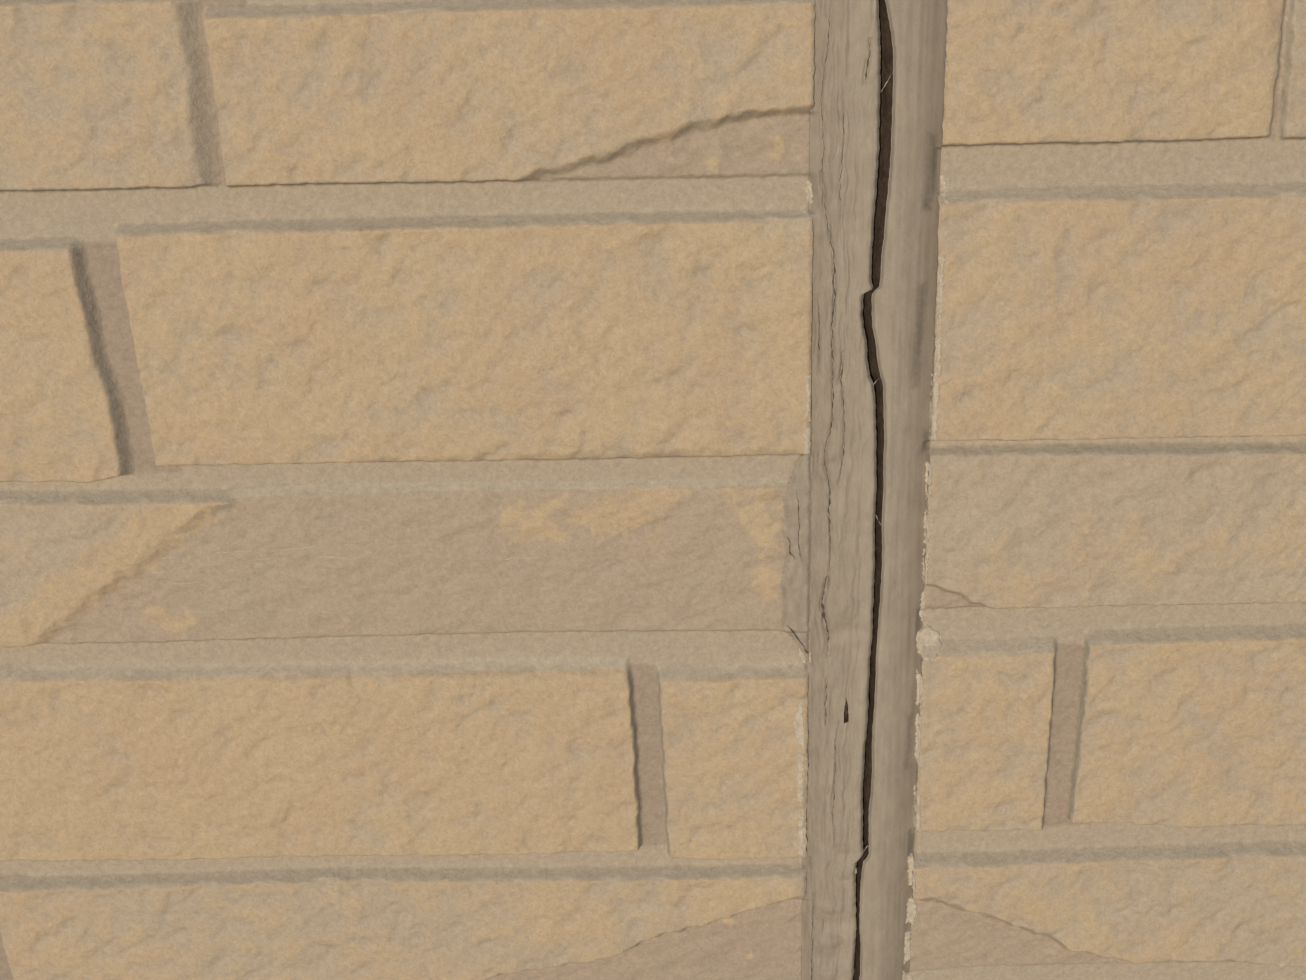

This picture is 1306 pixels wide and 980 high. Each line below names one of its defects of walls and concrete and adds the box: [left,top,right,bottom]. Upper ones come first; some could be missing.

crack [818,0,893,980]